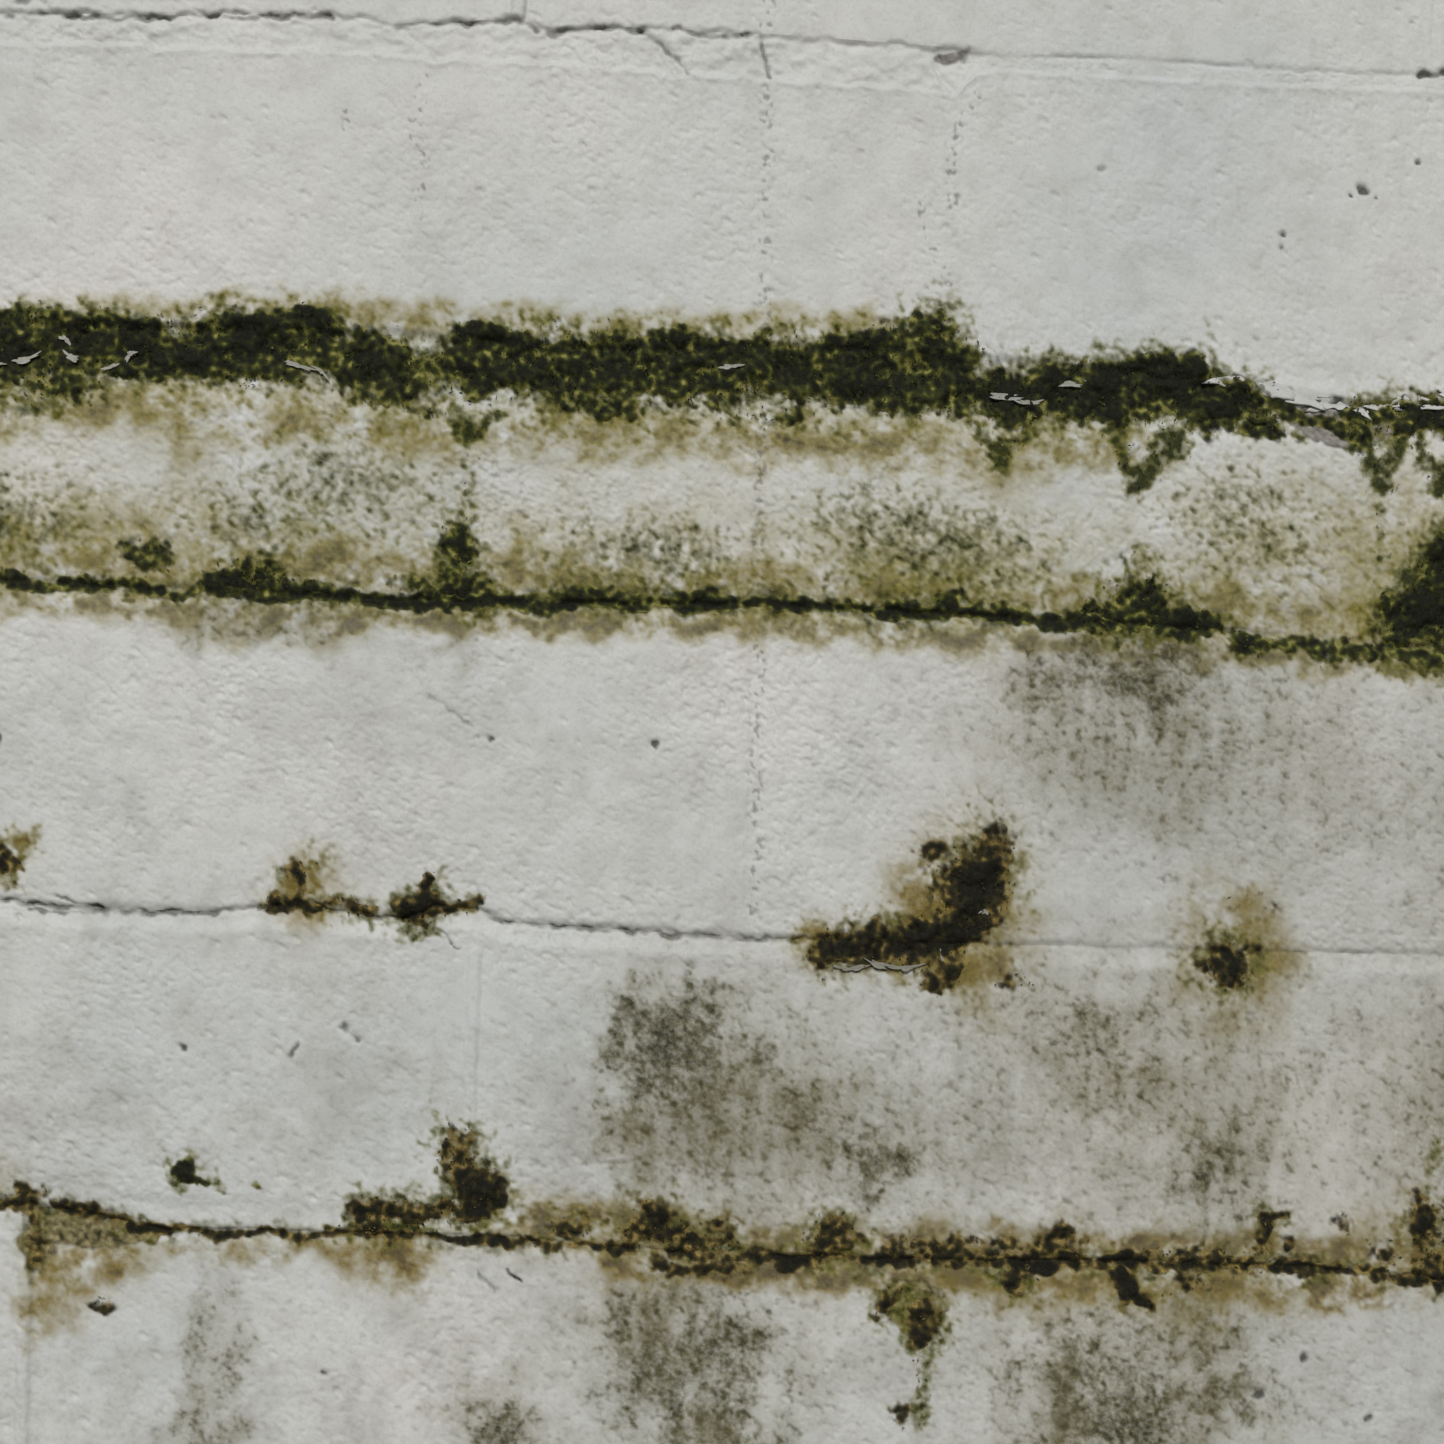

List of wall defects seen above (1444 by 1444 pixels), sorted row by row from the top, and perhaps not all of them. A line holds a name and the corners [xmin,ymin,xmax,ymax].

crack [1417,70,1444,78]
water stain [713,313,756,327]
water stain [52,383,209,446]
water stain [0,394,438,636]
water stain [309,487,1109,653]
water stain [510,404,950,463]
water stain [998,429,1134,487]
water stain [1006,489,1444,758]
peeling [1202,372,1444,448]
water stain [600,964,777,1178]
water stain [780,1080,918,1210]
water stain [1167,1107,1269,1222]